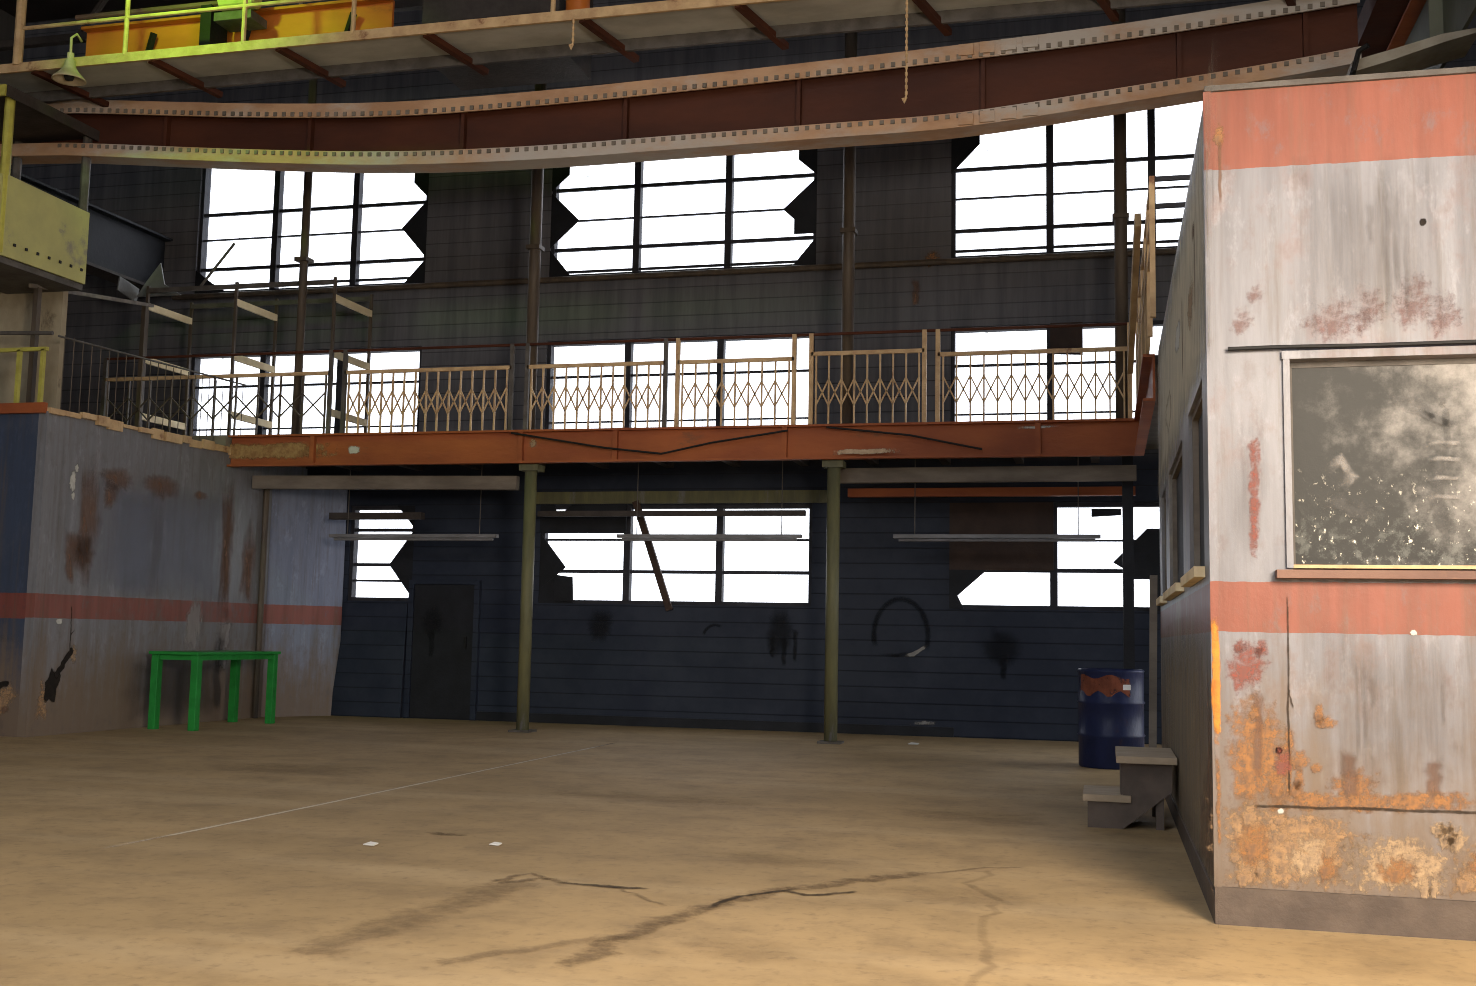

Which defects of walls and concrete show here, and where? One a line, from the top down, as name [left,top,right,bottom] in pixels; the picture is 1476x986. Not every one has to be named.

rust [66,471,127,581]
rust [1249,441,1260,548]
rust [1201,621,1471,858]
peeling [1208,802,1476,899]
crack [562,873,914,962]